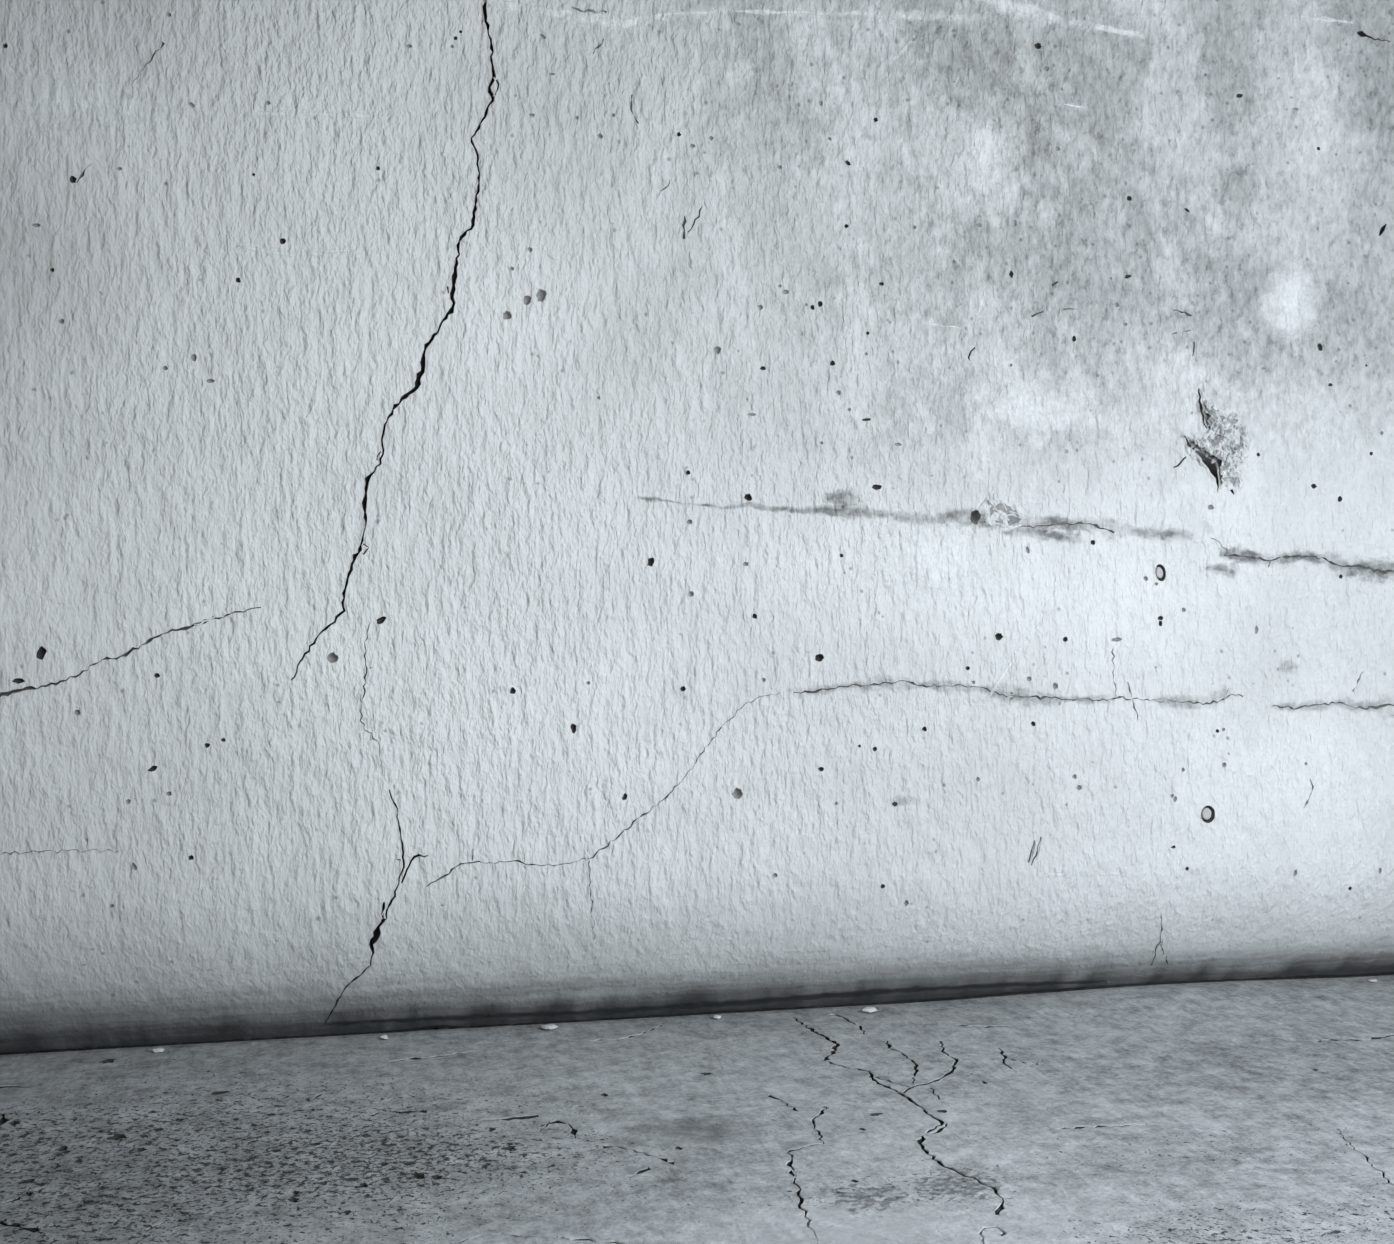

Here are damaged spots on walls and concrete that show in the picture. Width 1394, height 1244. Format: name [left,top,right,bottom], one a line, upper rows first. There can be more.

spalling [1184,390,1260,510]
crack [290,0,1394,1022]
crack [0,605,261,699]
crack [0,848,120,856]
crack [767,1095,828,1244]
crack [793,1014,1044,1244]
crack [450,1232,633,1244]